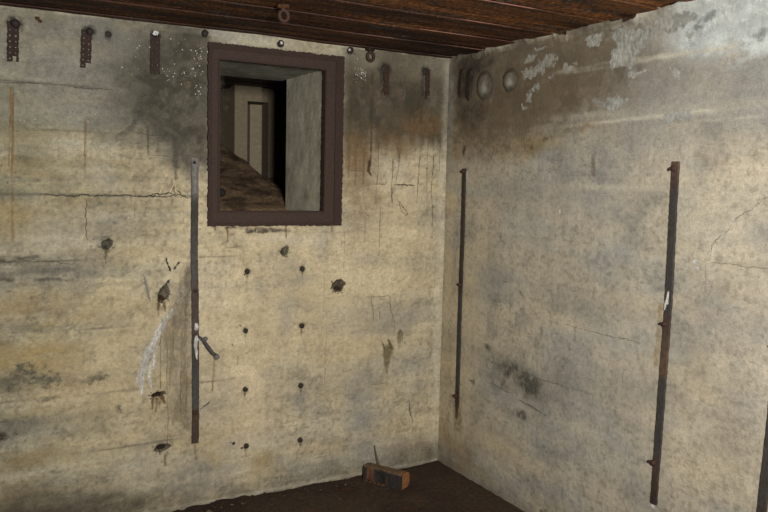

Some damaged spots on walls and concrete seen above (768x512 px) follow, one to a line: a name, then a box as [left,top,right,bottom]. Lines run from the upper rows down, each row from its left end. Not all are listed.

leakage [137,41,207,194]
leakage [454,27,625,152]
crack [34,190,191,240]
crack [693,197,768,300]
leakage [136,267,200,428]